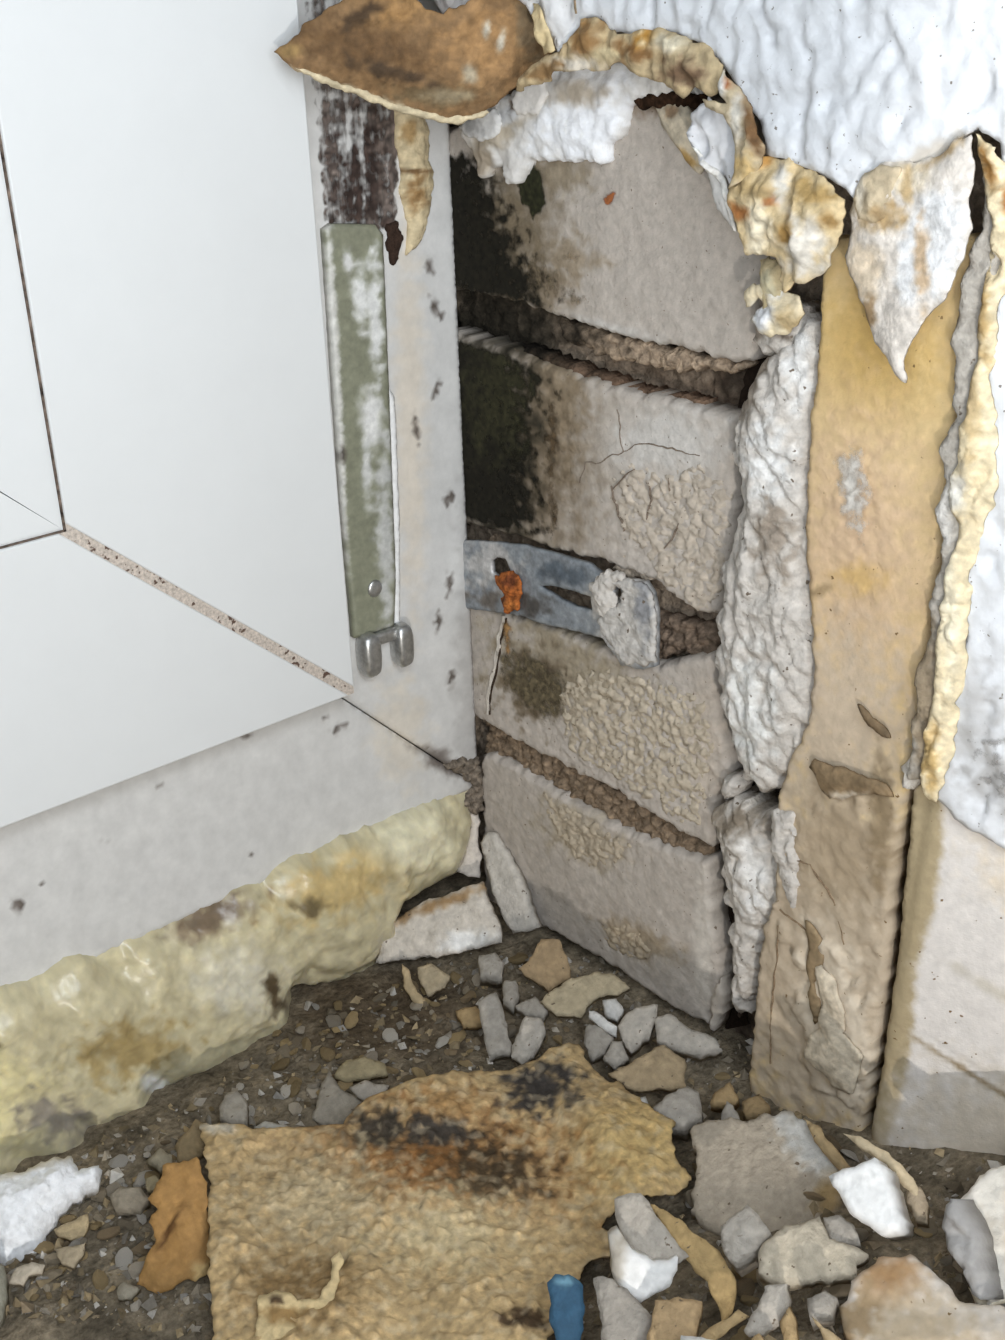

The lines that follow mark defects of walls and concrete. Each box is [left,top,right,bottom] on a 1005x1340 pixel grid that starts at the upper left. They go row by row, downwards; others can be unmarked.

damp [306,0,340,18]
damp [317,84,399,229]
flaking render [459,62,674,184]
damp [450,152,579,308]
damp [458,341,561,534]
spalling [838,451,871,532]
spalling [906,176,1000,780]
corrosion [495,571,523,654]
flaking render [559,298,822,1033]
spalling [543,791,632,867]